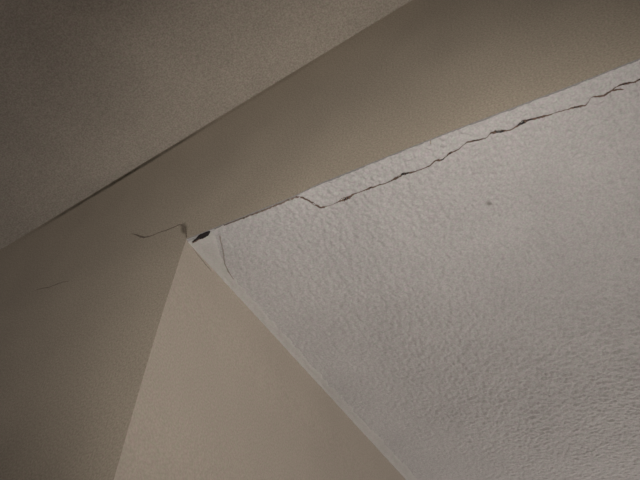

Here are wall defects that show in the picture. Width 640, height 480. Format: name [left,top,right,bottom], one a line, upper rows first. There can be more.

crack [134,79,640,279]